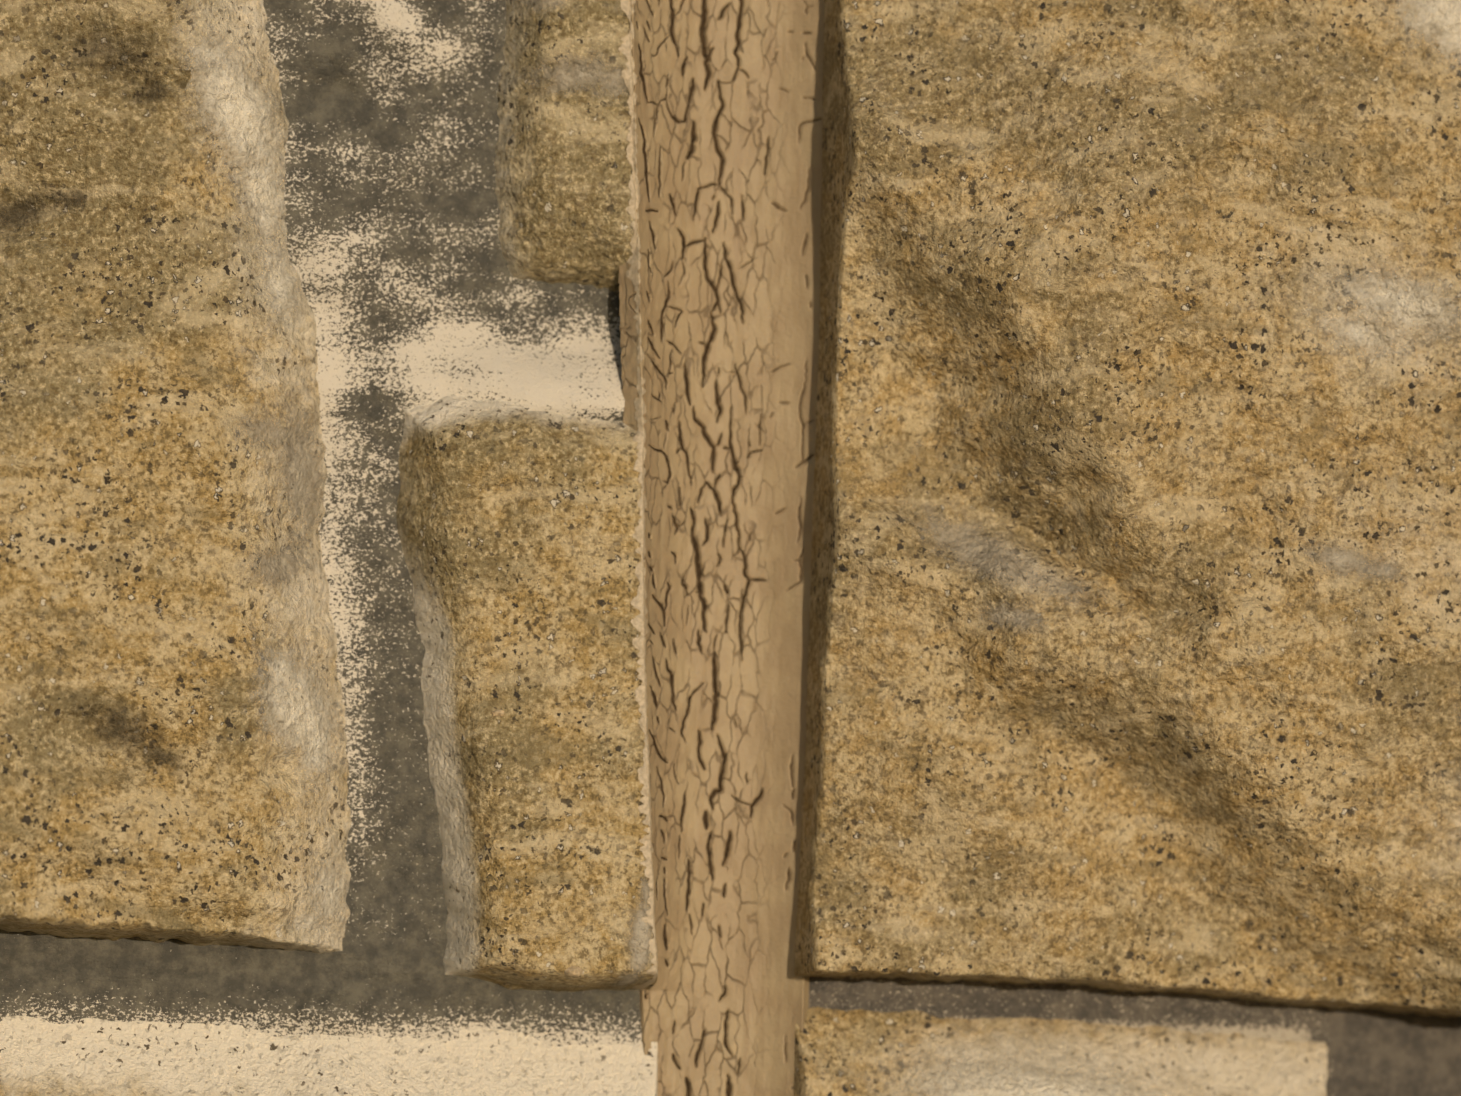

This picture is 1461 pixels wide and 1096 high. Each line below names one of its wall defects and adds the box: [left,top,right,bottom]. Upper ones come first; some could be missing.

crack [636,0,822,999]
crack [672,985,740,1096]